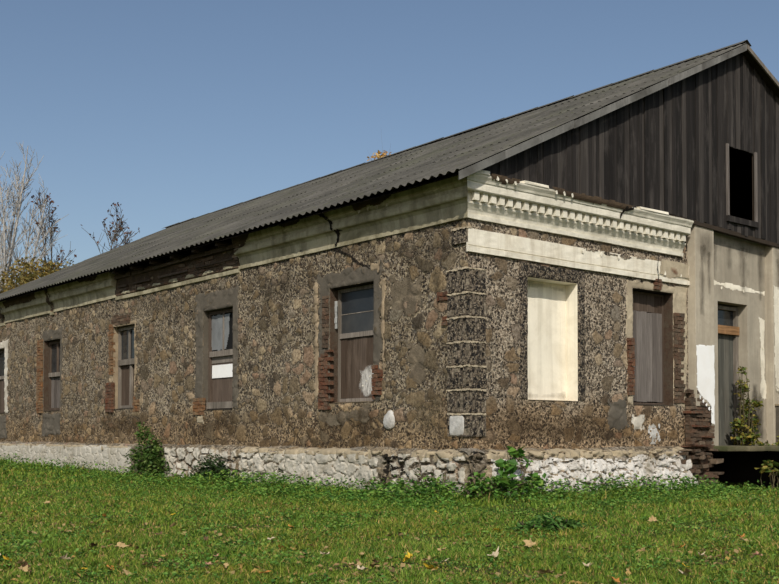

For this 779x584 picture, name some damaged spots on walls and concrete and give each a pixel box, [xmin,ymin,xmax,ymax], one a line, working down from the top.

spalling [114,233,249,296]
crack [318,213,370,269]
peeling [714,280,779,399]
peeling [489,313,715,498]